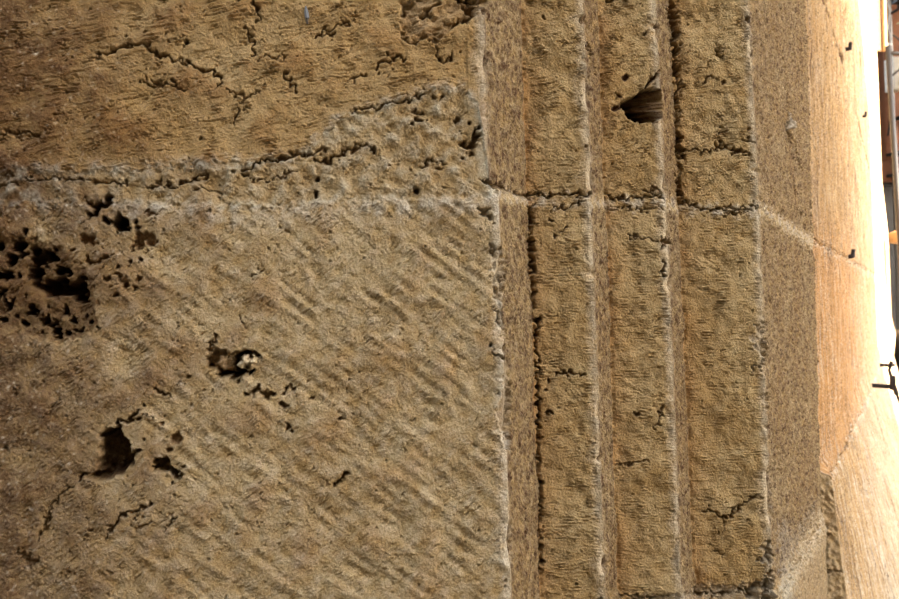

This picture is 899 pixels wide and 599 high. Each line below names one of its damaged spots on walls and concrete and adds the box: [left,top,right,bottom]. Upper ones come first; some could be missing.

crack [237,0,298,94]
spalling [396,0,487,47]
crack [94,40,261,125]
spalling [610,69,664,124]
spalling [132,208,159,230]
spalling [0,228,100,340]
spalling [101,256,143,298]
peeling [206,349,261,379]
spalling [243,383,296,409]
spalling [78,418,142,483]
spalling [151,430,186,485]